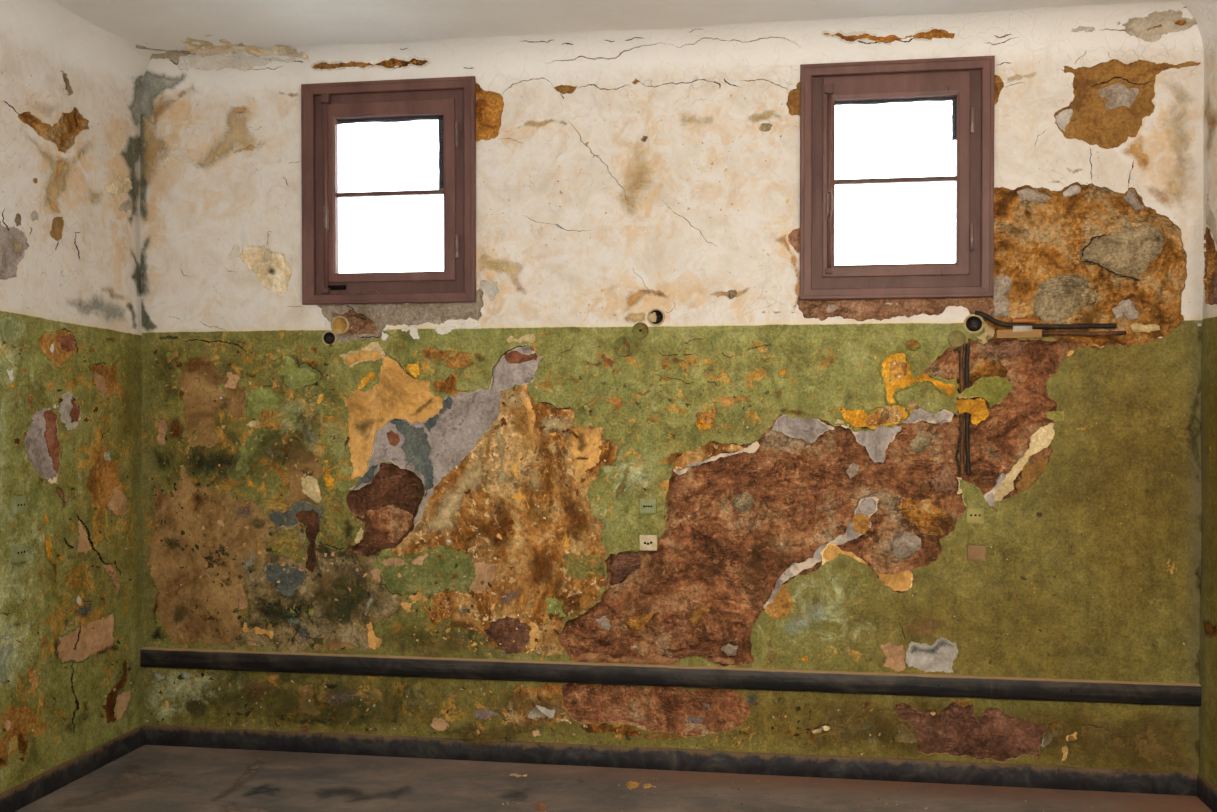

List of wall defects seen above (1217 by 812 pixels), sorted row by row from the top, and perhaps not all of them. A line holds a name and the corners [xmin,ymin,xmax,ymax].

spalling [4,71,89,154]
damp [122,72,183,221]
peeling [136,35,431,71]
spalling [476,83,504,142]
crack [503,29,796,203]
spalling [1054,59,1200,149]
peeling [0,200,64,280]
damp [78,239,155,331]
spalling [1203,195,1217,305]
spalling [0,324,134,578]
spalling [149,182,1187,673]
peeling [0,547,135,770]